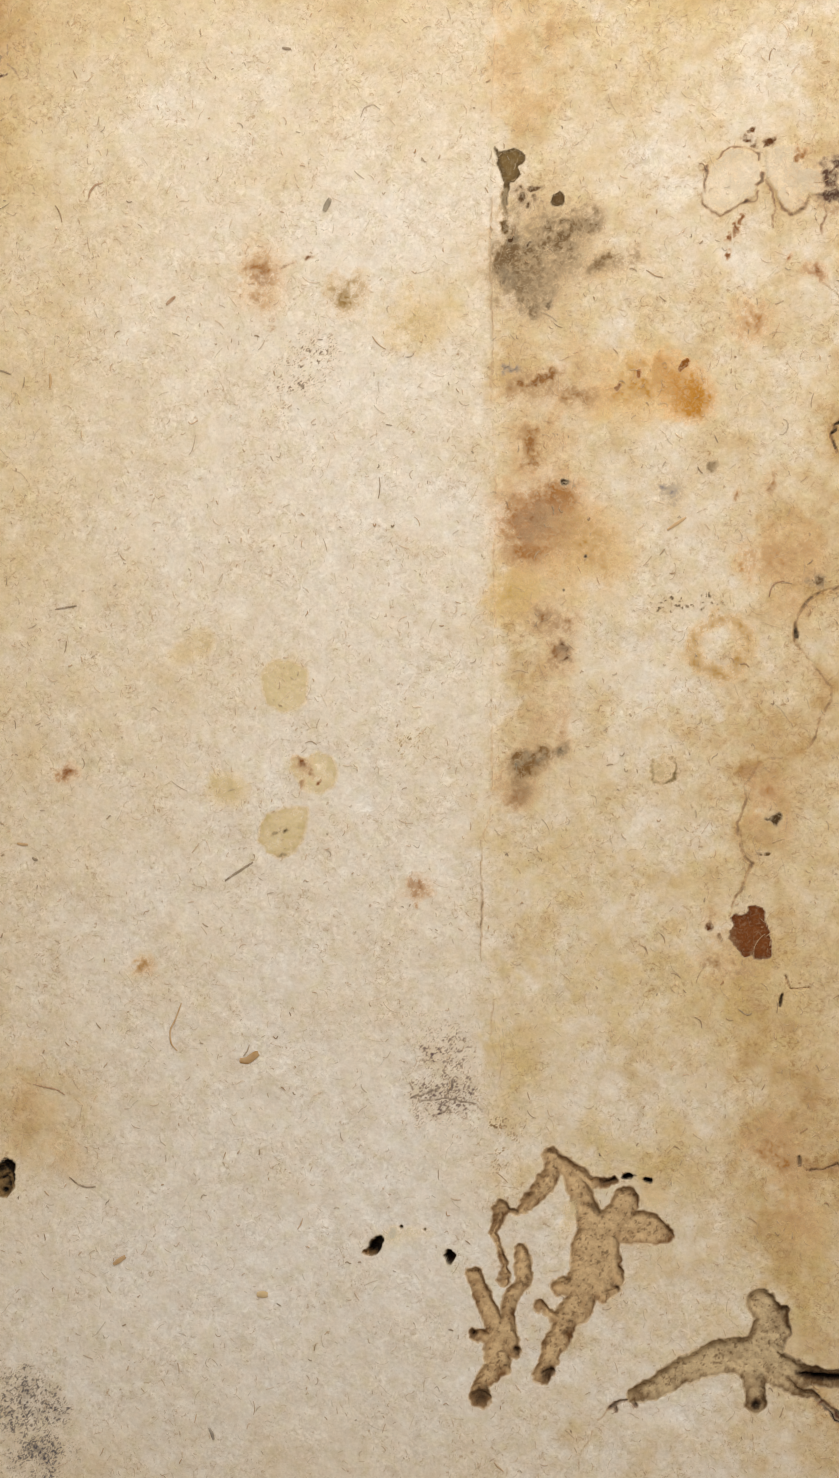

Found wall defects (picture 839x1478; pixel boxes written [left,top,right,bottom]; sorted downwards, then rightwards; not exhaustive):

water stain [490,191,640,320]
corrosion [597,353,714,420]
crack [829,421,839,453]
water stain [496,362,615,677]
crack [793,586,839,741]
crack [729,778,754,916]
corrosion [702,905,772,978]
spalling [472,1387,488,1404]
spalling [796,1370,839,1380]